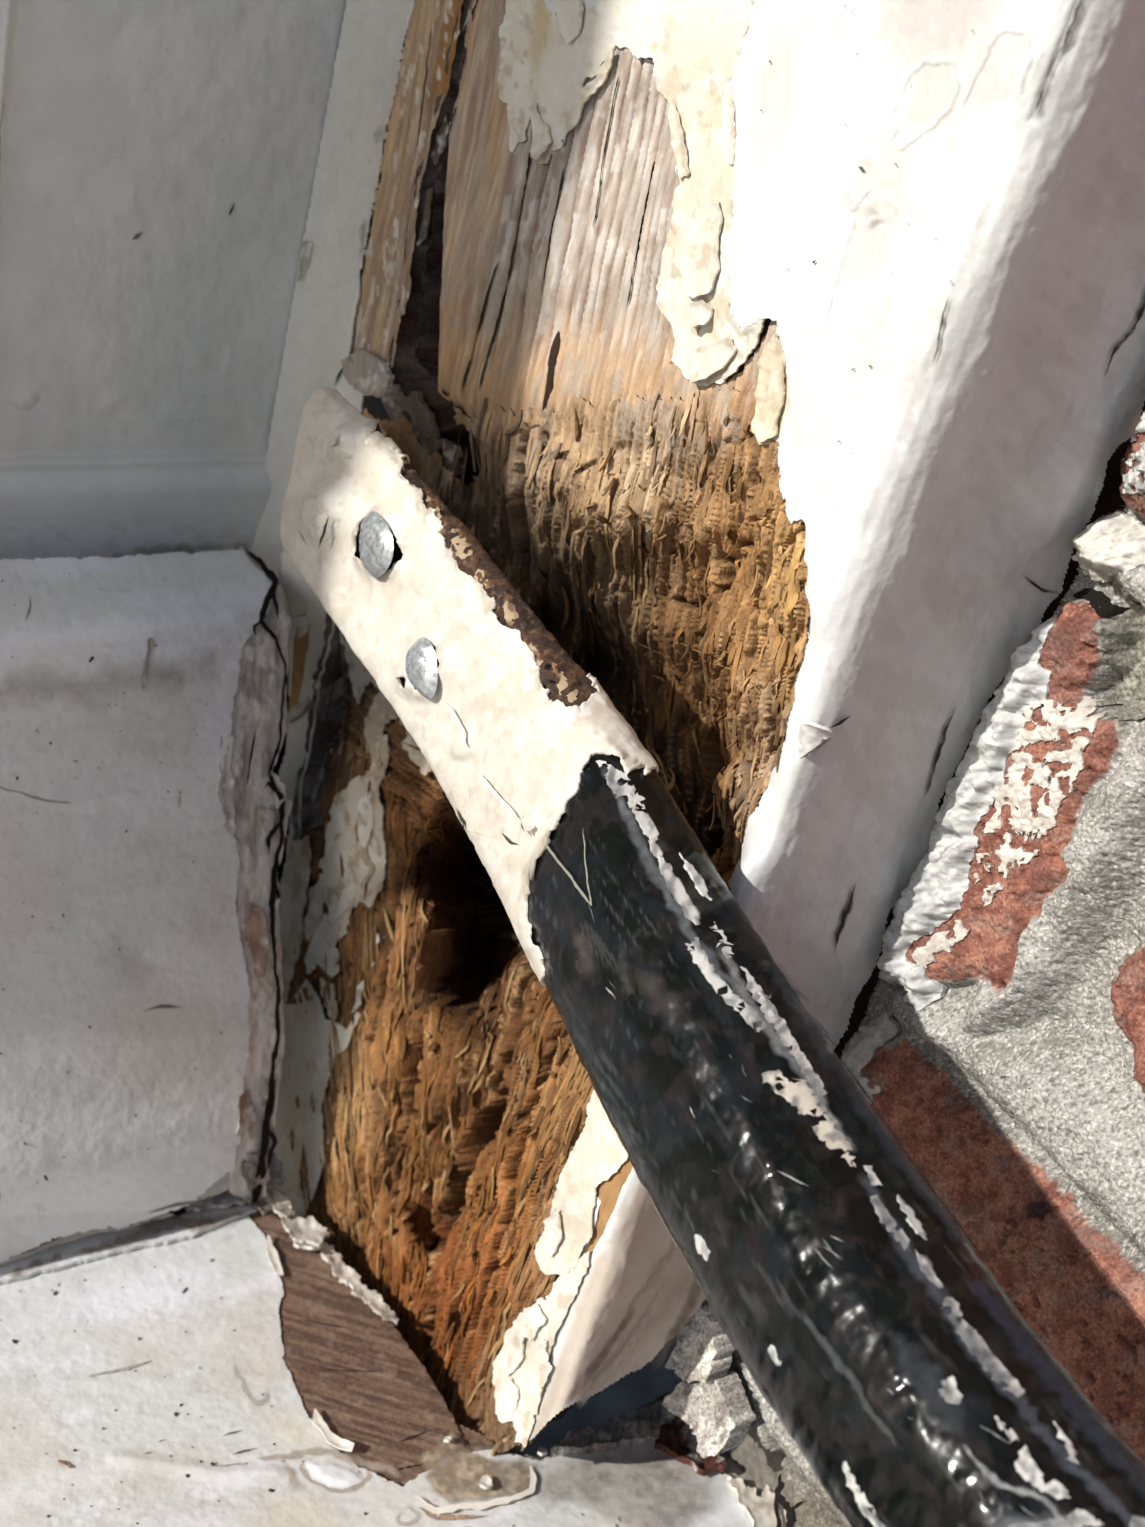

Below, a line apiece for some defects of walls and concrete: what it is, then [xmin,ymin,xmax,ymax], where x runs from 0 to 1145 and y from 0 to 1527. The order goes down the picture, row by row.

crack [388,0,488,491]
peeling [351,0,789,445]
crack [1036,0,1085,114]
crack [1106,295,1145,372]
crack [10,548,352,1257]
peeling [217,726,238,833]
peeling [236,616,461,1471]
peeling [492,1090,633,1447]
peeling [573,1243,676,1402]